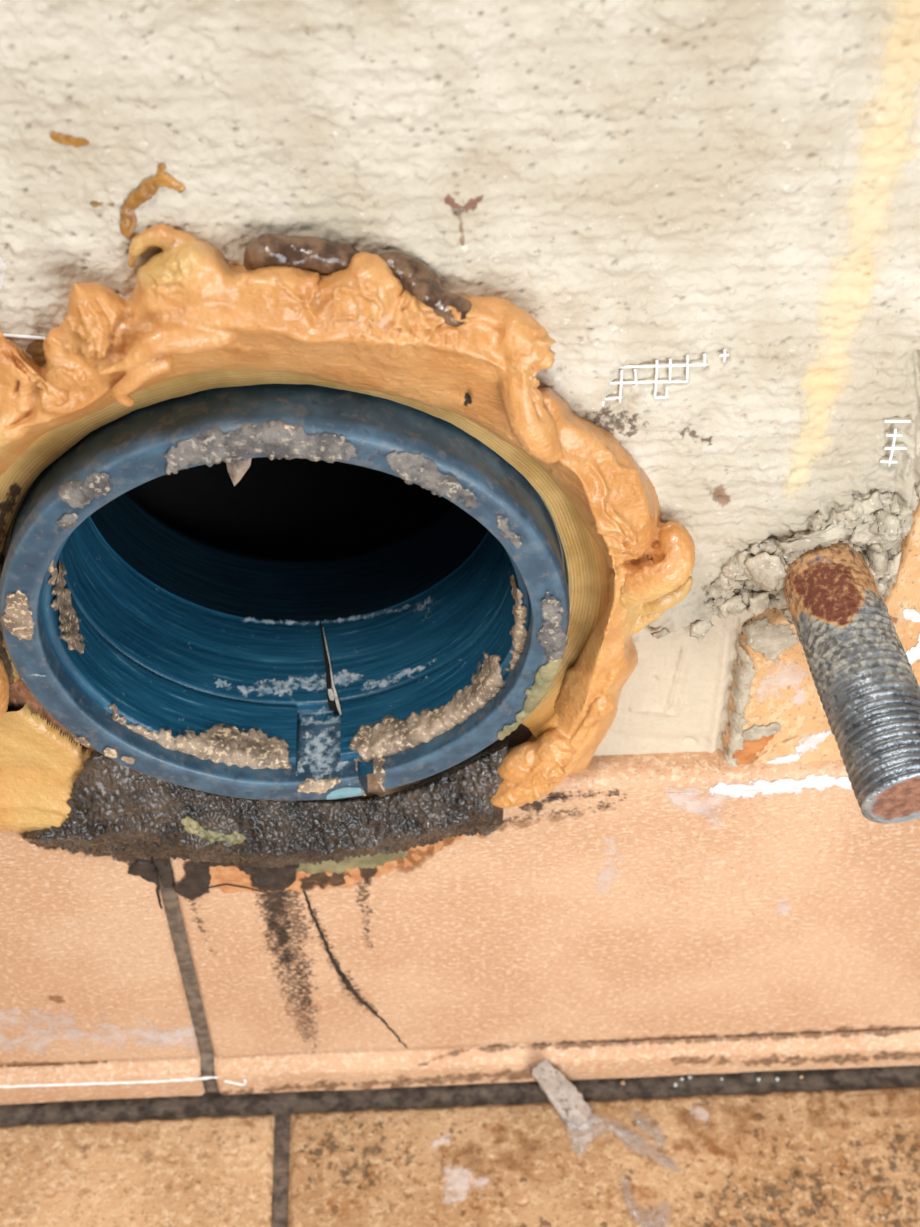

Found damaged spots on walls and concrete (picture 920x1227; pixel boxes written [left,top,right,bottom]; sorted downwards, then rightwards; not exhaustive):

spalling [690,481,920,644]
crack [207,884,268,893]
damp [256,889,318,1047]
damp [356,883,373,948]
crack [302,890,428,1066]